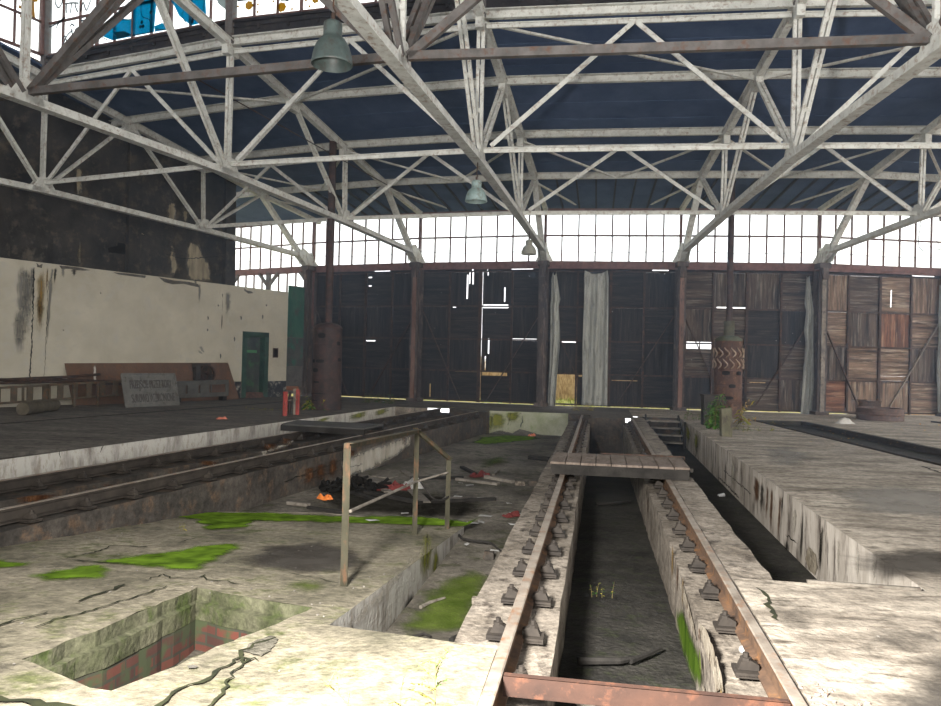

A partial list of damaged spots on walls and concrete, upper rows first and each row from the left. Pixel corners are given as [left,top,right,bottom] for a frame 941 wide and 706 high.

water stain [15,270,34,344]
crack [0,545,239,627]
crack [0,696,76,706]
crack [154,637,275,706]